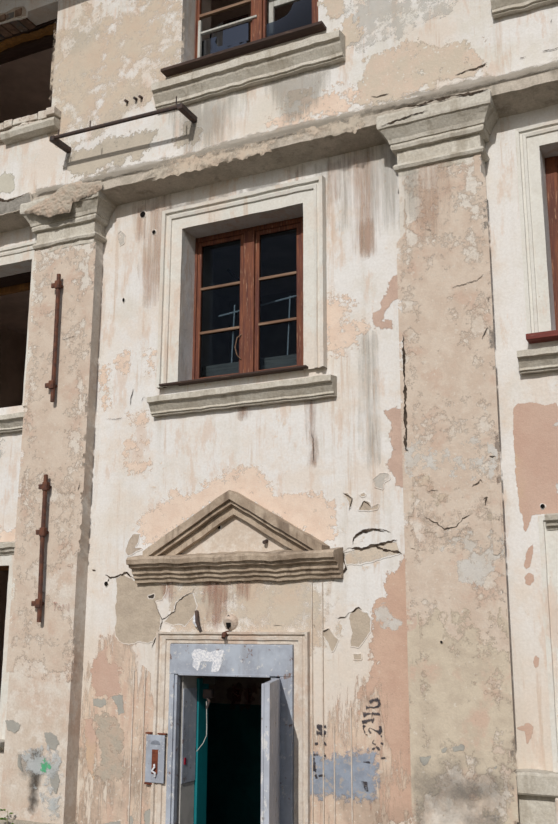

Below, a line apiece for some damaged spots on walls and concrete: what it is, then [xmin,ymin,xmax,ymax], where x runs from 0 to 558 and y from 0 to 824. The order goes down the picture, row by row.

peeling [317,0,365,49]
peeling [0,0,193,218]
peeling [137,37,489,181]
crack [372,62,491,126]
crack [400,337,408,450]
peeling [0,242,131,682]
peeling [75,154,534,824]
crack [343,493,402,573]
crack [423,479,488,530]
peeling [513,402,558,531]
peeling [5,720,20,733]
damp [30,772,39,809]